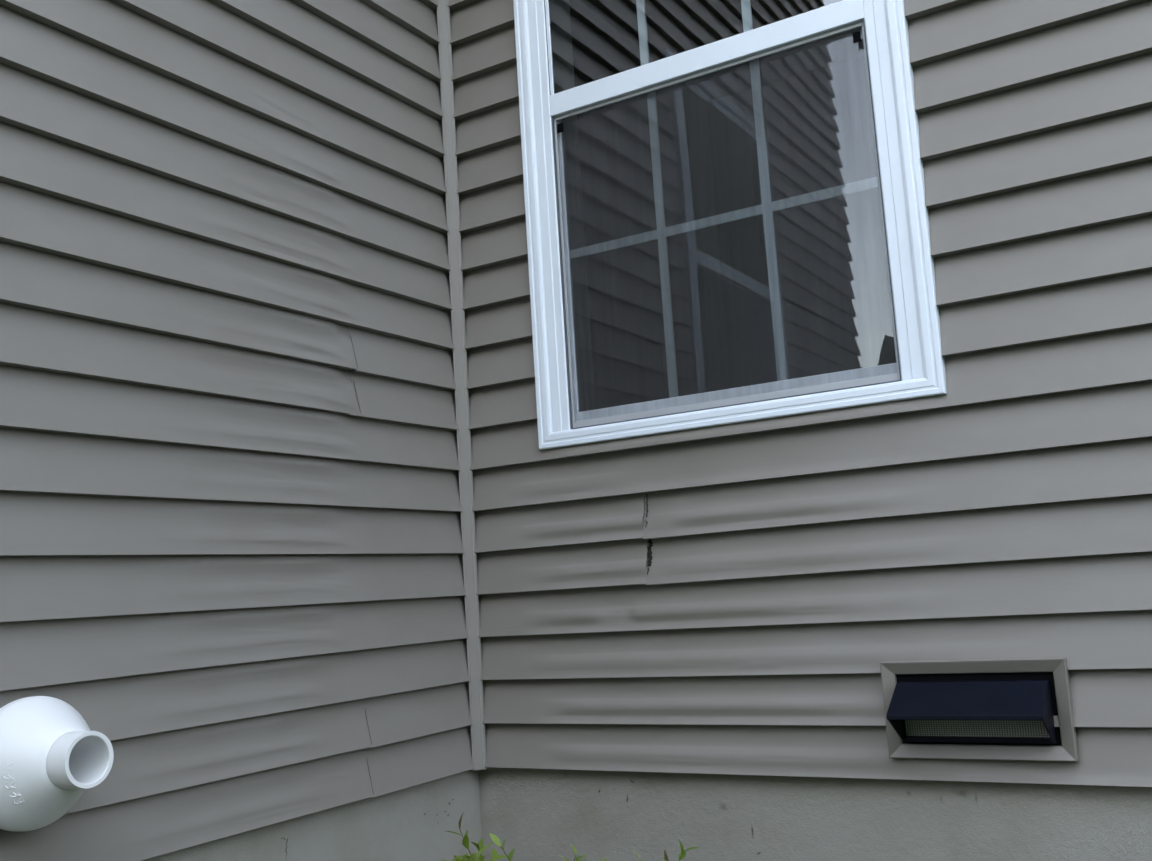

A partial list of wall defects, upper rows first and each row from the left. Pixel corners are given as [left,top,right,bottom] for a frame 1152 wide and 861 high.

crack [645,493,653,574]